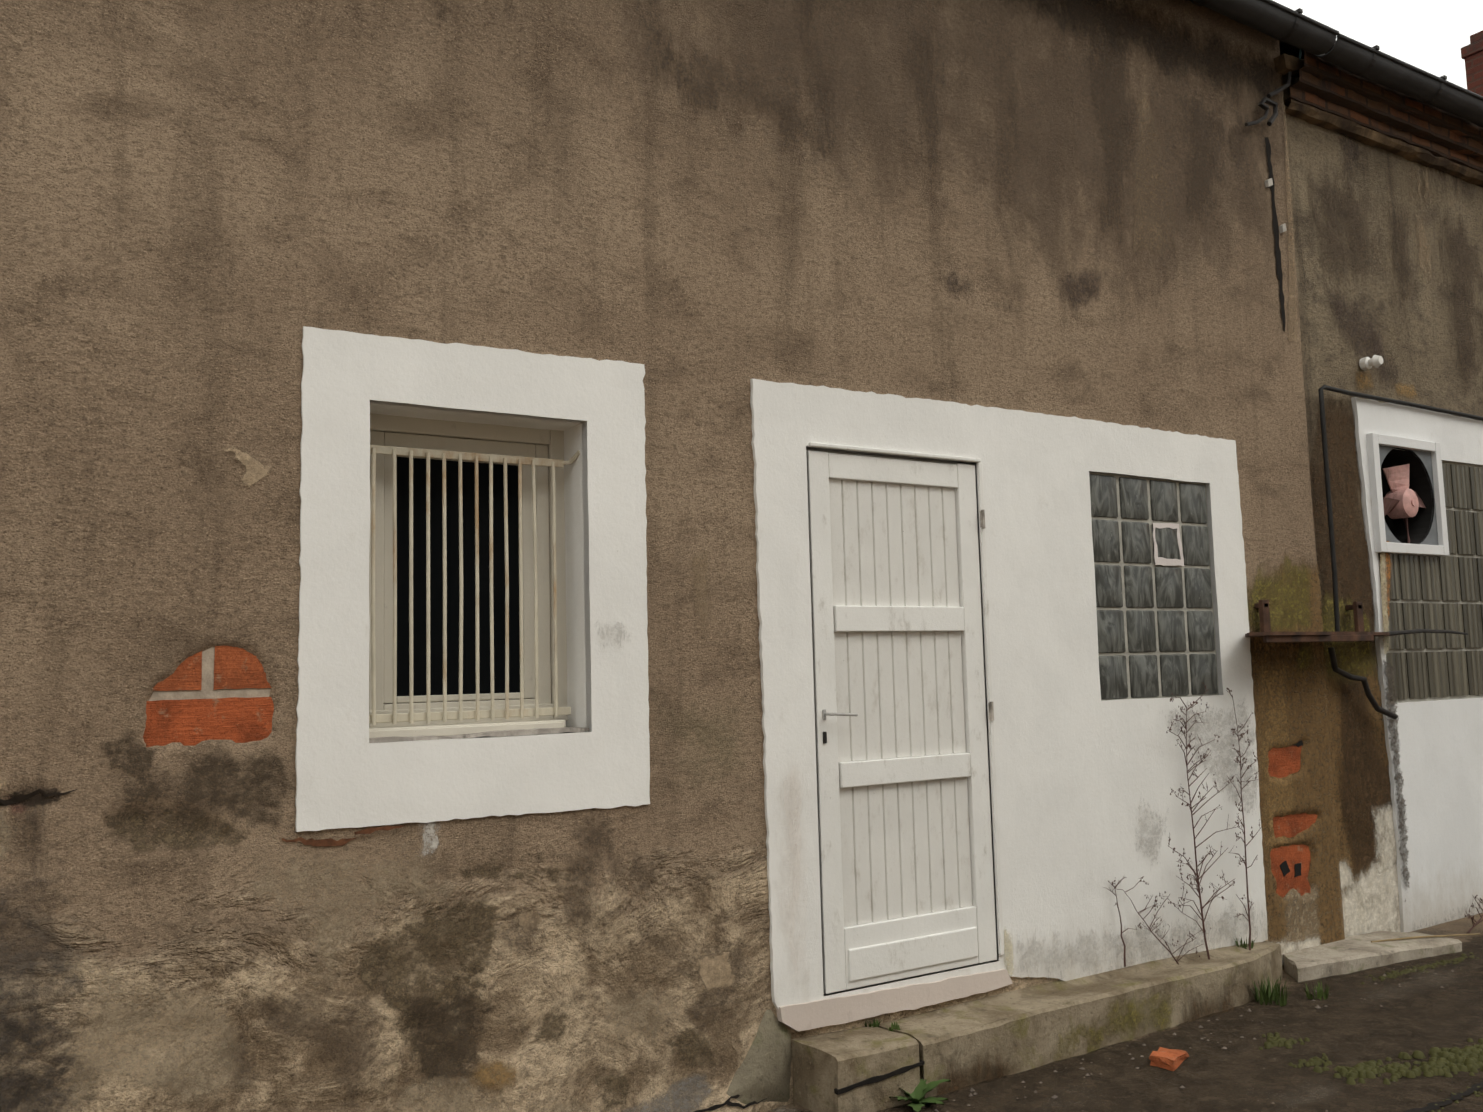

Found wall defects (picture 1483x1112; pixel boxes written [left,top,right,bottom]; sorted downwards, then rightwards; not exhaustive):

water stain [1034,0,1273,97]
spalling [222,448,272,487]
water stain [1249,397,1396,950]
spalling [105,646,288,851]
spalling [1268,740,1303,778]
crack [0,773,77,856]
spalling [1270,813,1317,898]
water stain [535,1013,566,1043]
water stain [670,948,742,1067]
crack [694,1095,767,1112]